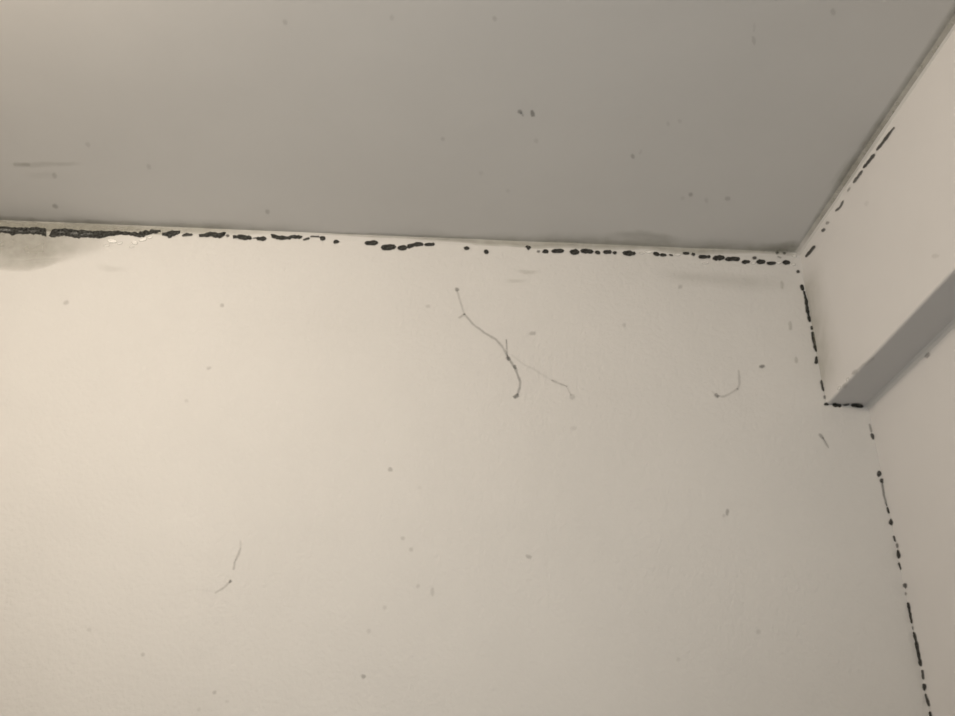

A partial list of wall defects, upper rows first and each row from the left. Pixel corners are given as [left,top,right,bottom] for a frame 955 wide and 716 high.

water stain [0,221,81,247]